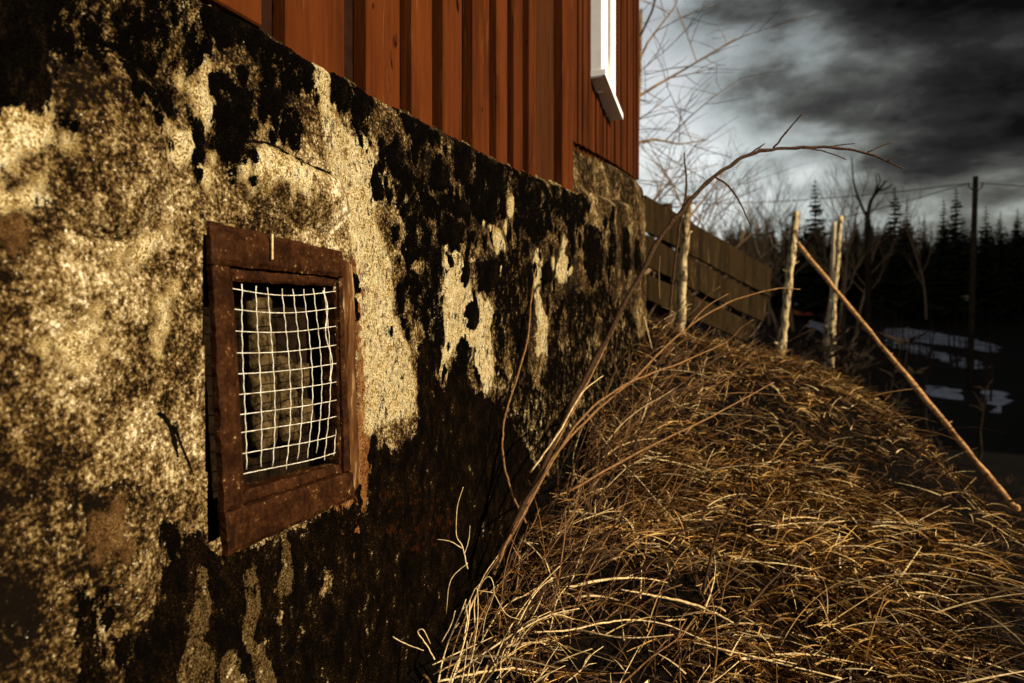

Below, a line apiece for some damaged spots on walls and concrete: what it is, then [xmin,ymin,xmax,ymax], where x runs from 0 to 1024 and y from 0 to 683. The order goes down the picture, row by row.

leakage [72,231,642,683]